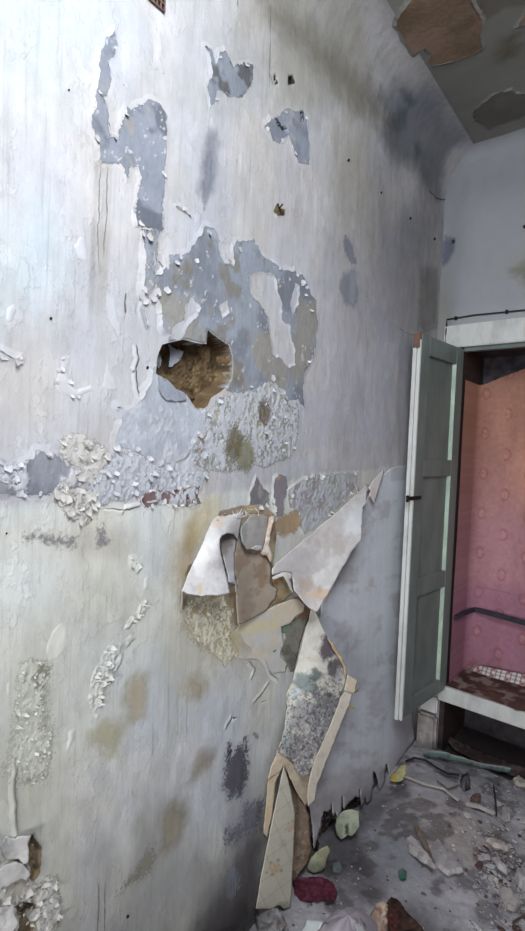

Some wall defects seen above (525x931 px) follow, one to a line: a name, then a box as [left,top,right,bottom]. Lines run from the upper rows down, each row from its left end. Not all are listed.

flaking render [392,0,487,67]
flaking render [470,87,525,131]
peeling [0,25,359,536]
peeling [184,595,238,667]
peeling [3,657,56,788]
flaking render [310,796,366,852]
flaking render [0,835,63,931]